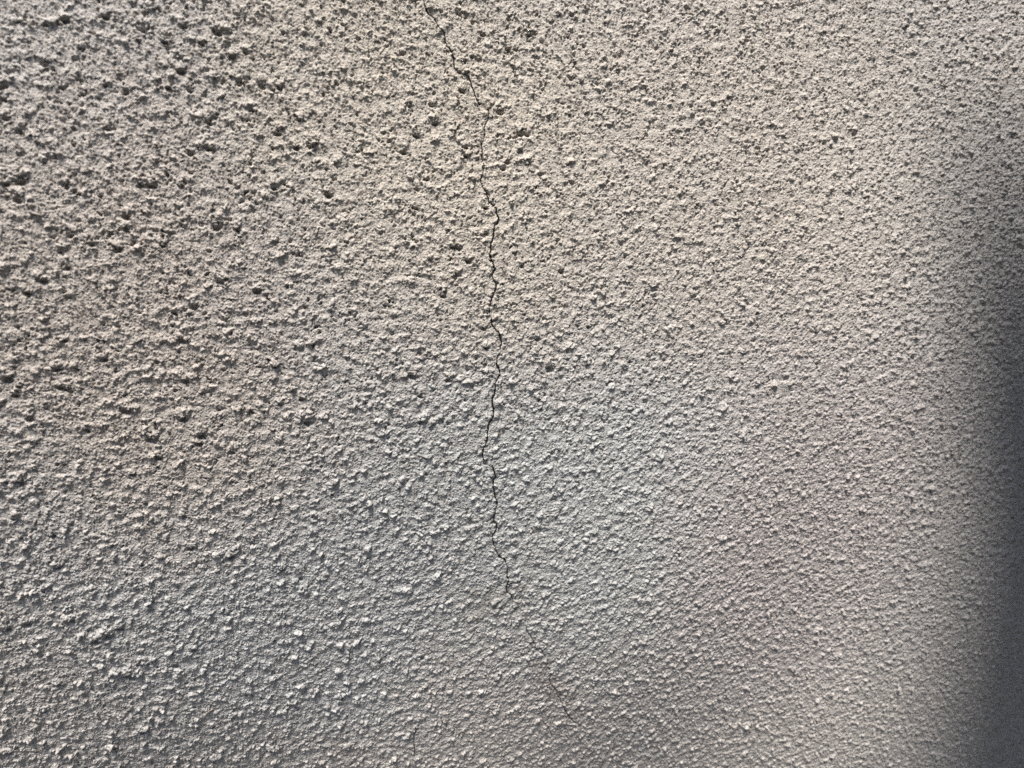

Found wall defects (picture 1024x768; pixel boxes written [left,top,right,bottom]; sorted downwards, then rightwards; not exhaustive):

crack [424,2,576,730]